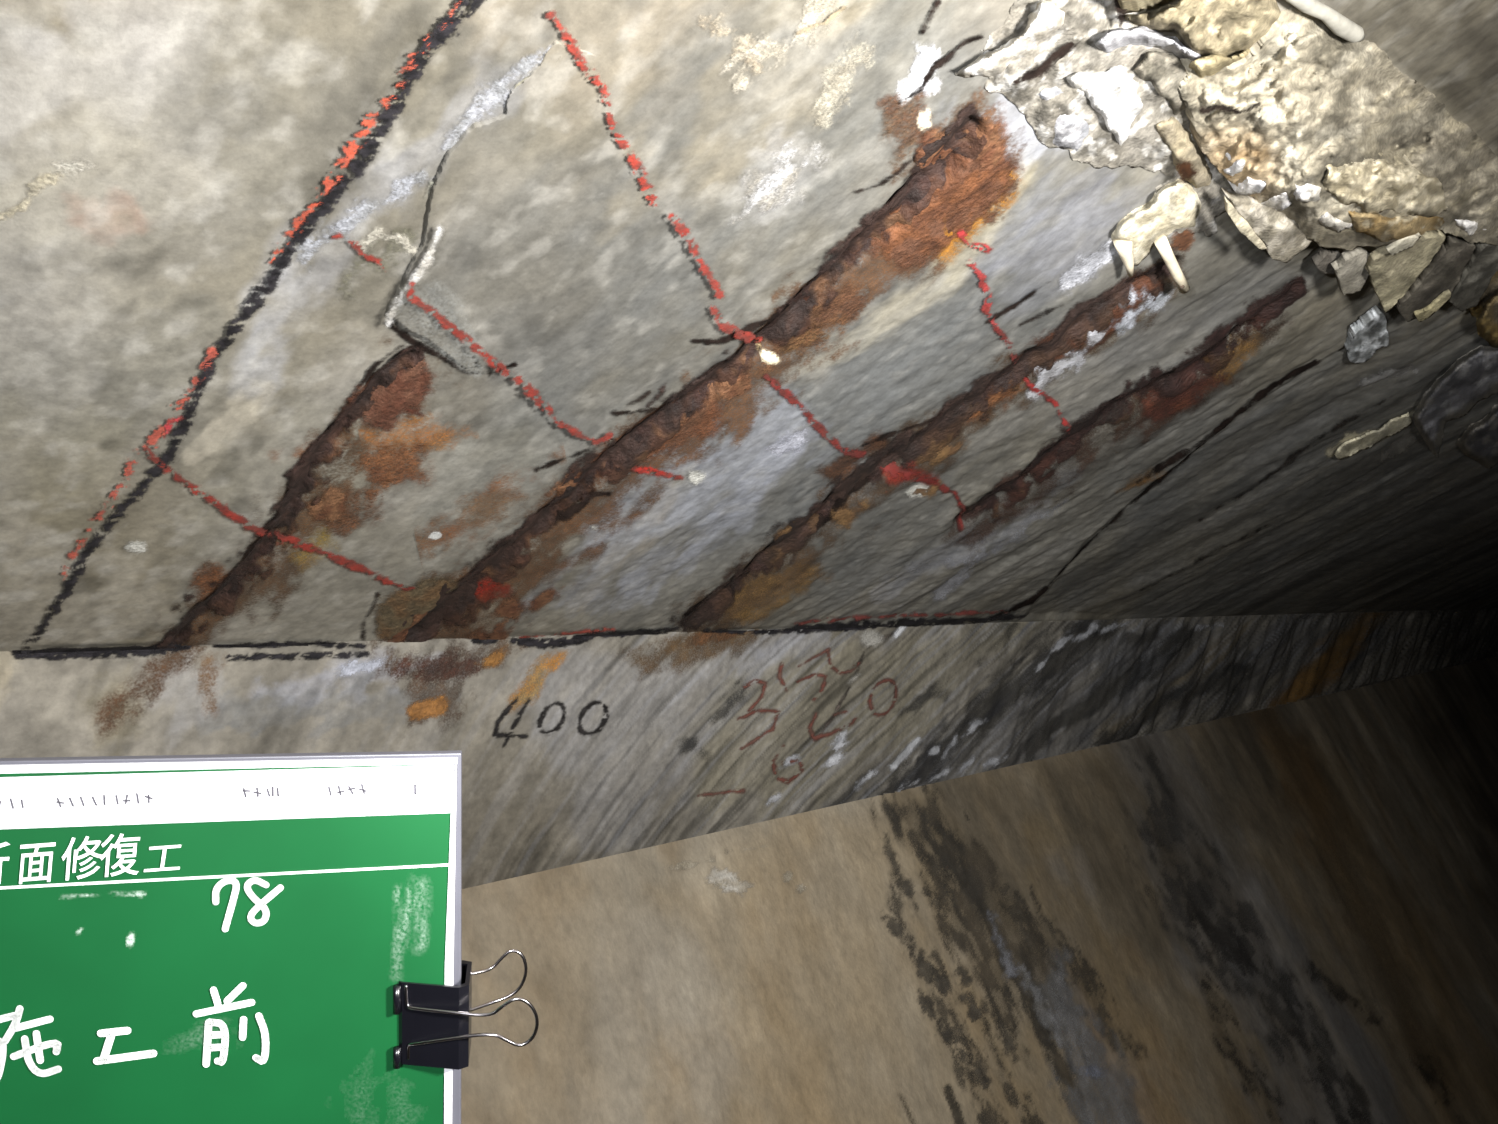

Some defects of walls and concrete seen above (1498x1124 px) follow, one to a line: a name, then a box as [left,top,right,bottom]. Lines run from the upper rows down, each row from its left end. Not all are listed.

corrosion [98,392,453,733]
damp [340,659,383,676]
crack [328,321,518,430]
crack [535,449,611,525]
corrosion [371,92,1022,725]
crack [692,273,820,345]
damp [826,731,847,767]
corrosion [627,257,1178,674]
crack [986,289,1058,326]
corrosion [948,321,1286,547]
spalling [955,276,1307,524]
damp [858,620,1224,1124]